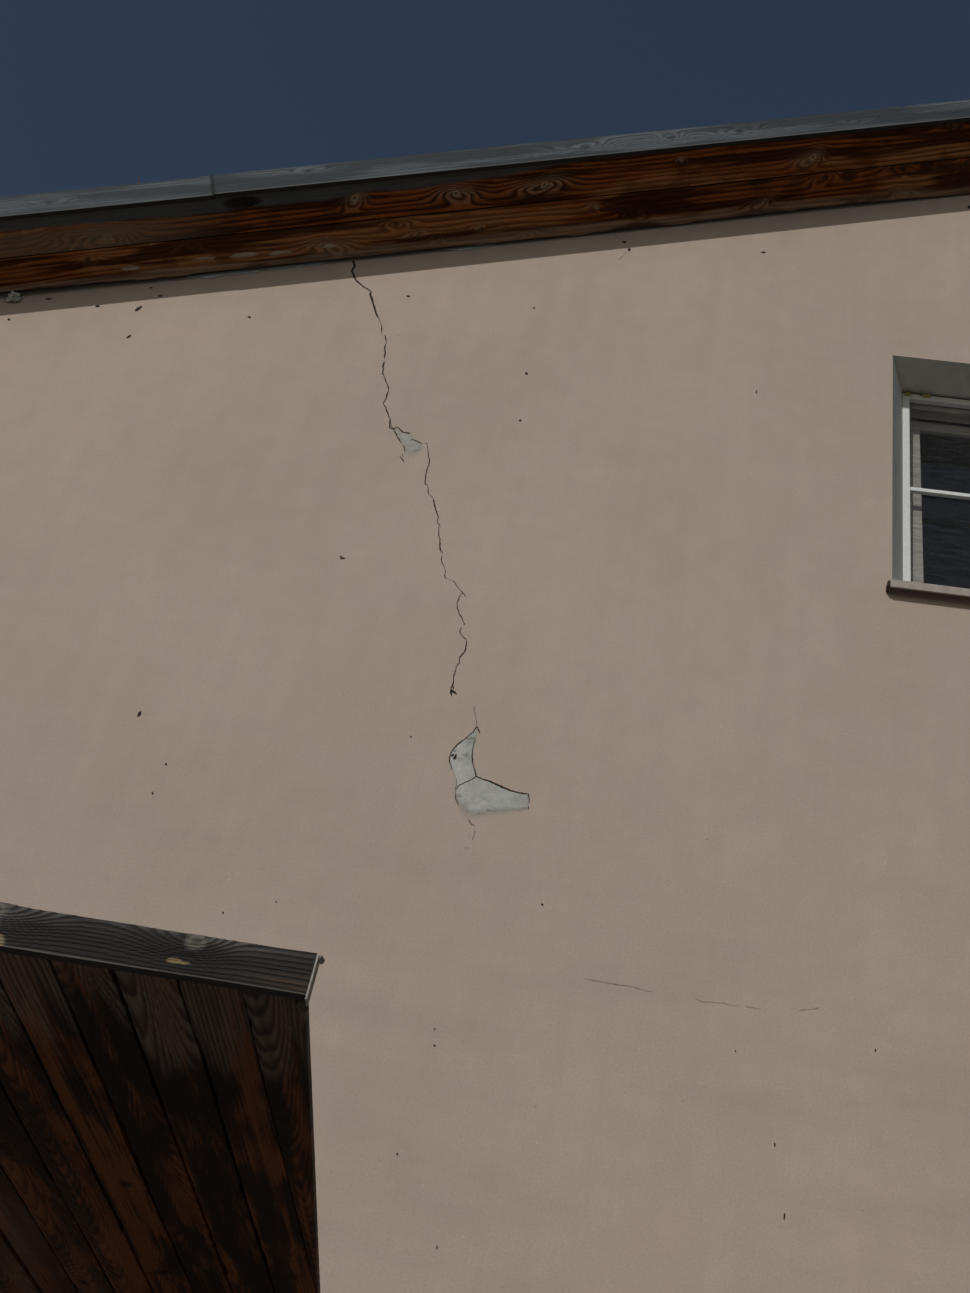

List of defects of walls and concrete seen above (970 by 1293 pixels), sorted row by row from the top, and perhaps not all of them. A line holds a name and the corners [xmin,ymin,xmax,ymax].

crack [351,261,477,725]
peeling [449,726,530,813]